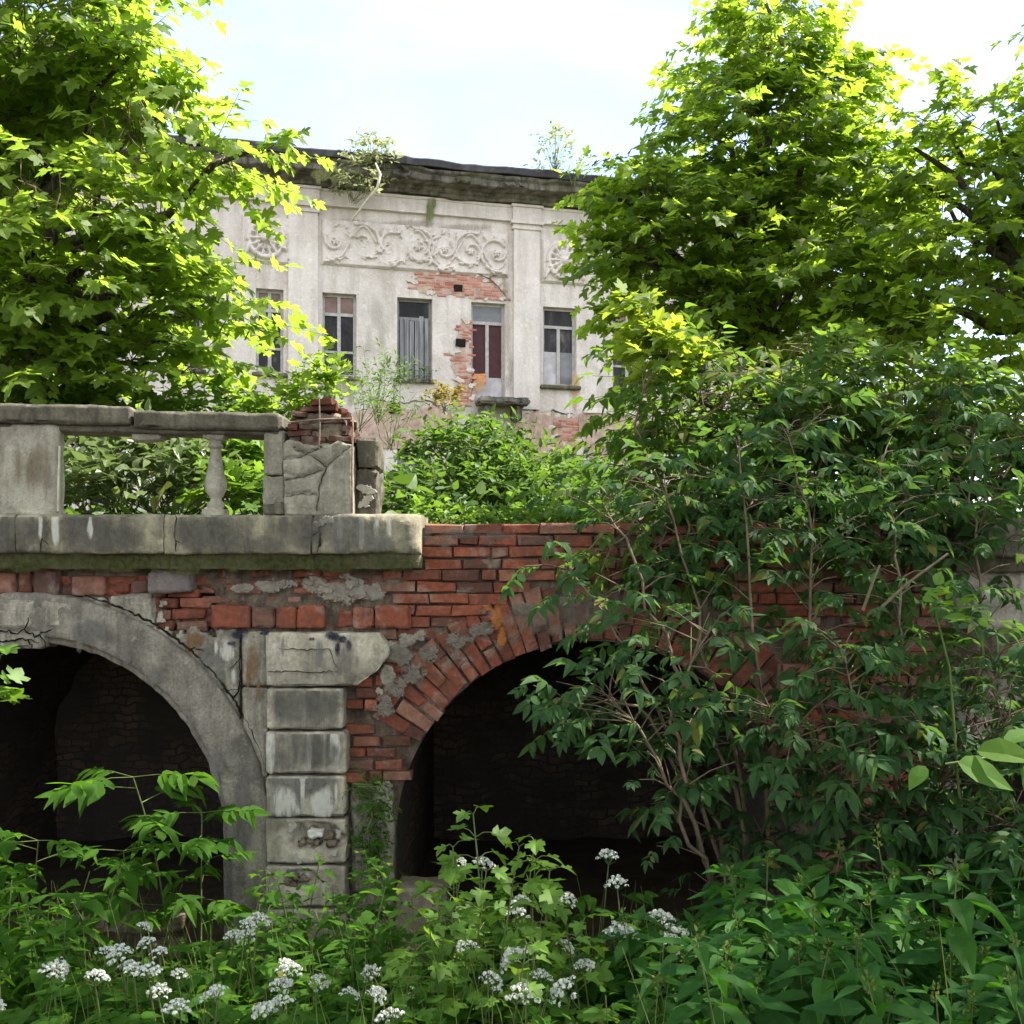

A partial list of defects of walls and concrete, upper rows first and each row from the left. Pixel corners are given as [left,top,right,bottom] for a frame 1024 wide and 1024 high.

spalling [406,272,511,301]
spalling [353,317,477,451]
crack [283,445,352,549]
crack [0,617,53,648]
crack [85,595,269,776]
flaking render [230,572,404,605]
flaking render [375,622,493,720]
spalling [279,823,342,887]